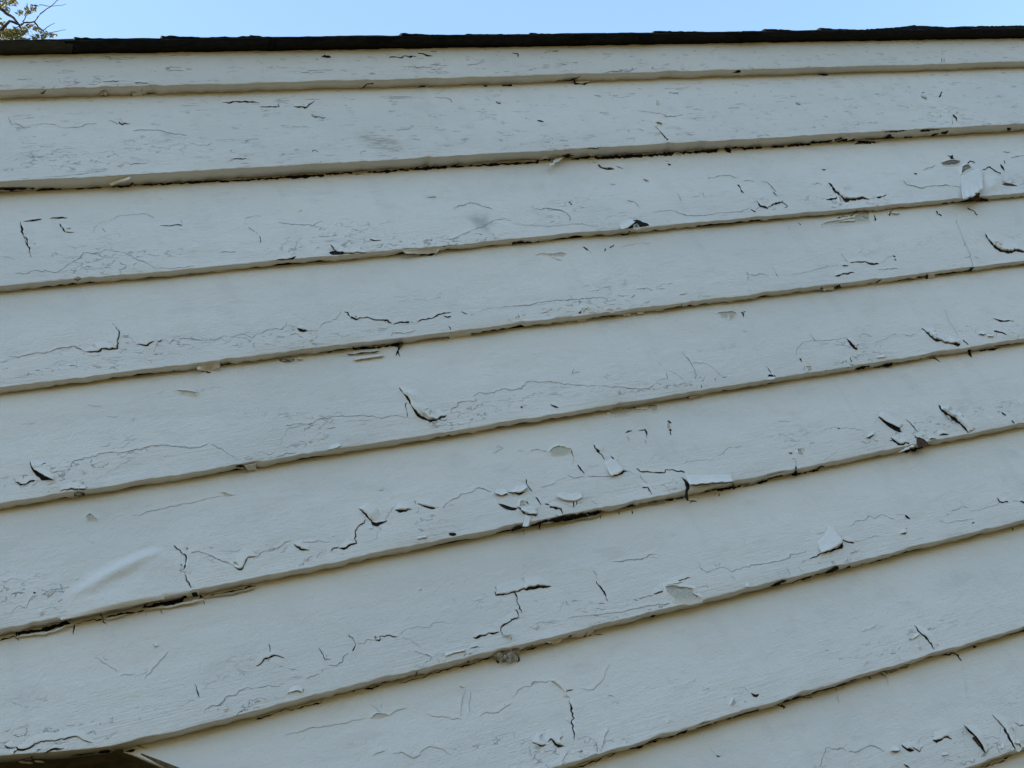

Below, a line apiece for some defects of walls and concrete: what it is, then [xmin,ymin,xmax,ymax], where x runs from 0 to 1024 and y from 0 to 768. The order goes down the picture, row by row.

peeling [938,155,989,202]
crack [9,213,195,274]
crack [0,283,700,366]
peeling [861,412,903,443]
peeling [898,404,975,453]
peeling [495,479,538,532]
peeling [671,474,734,503]
crack [174,484,492,588]
crack [473,552,662,639]
peeling [653,575,704,605]
crack [569,700,598,746]
crack [820,714,1022,768]